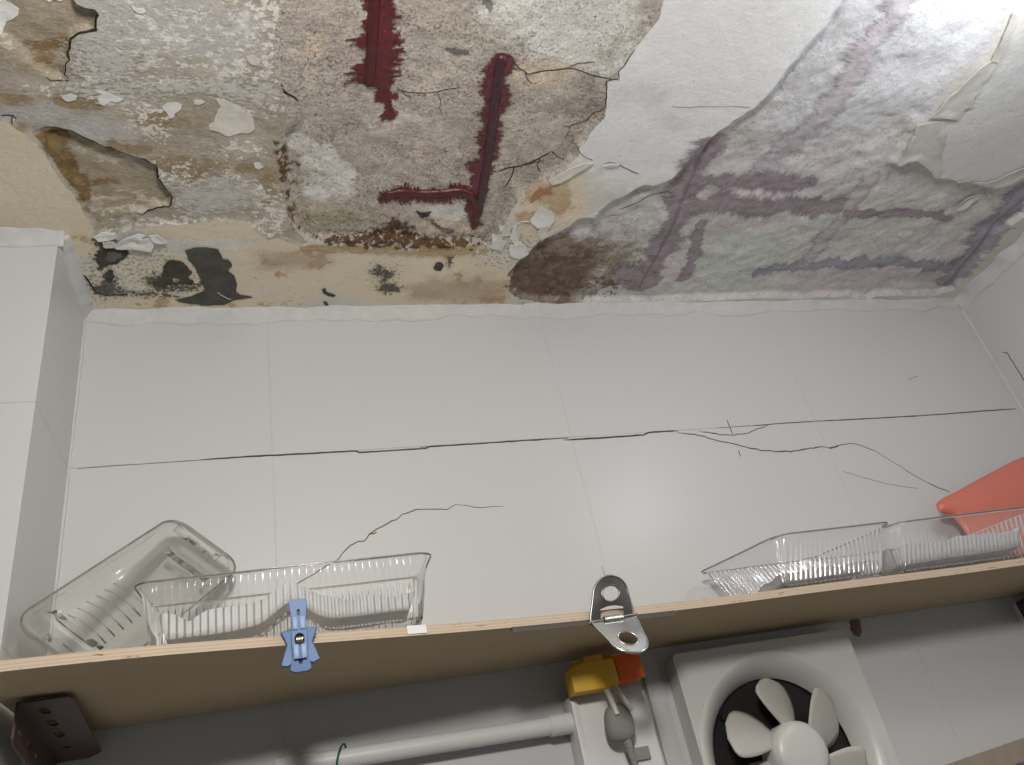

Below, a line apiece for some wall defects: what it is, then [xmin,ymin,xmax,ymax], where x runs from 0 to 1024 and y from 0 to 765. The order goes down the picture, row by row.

spalling [0,0,1024,306]
crack [498,49,672,210]
mould [83,238,204,300]
water stain [369,256,506,299]
crack [77,408,1016,492]
crack [297,504,504,584]